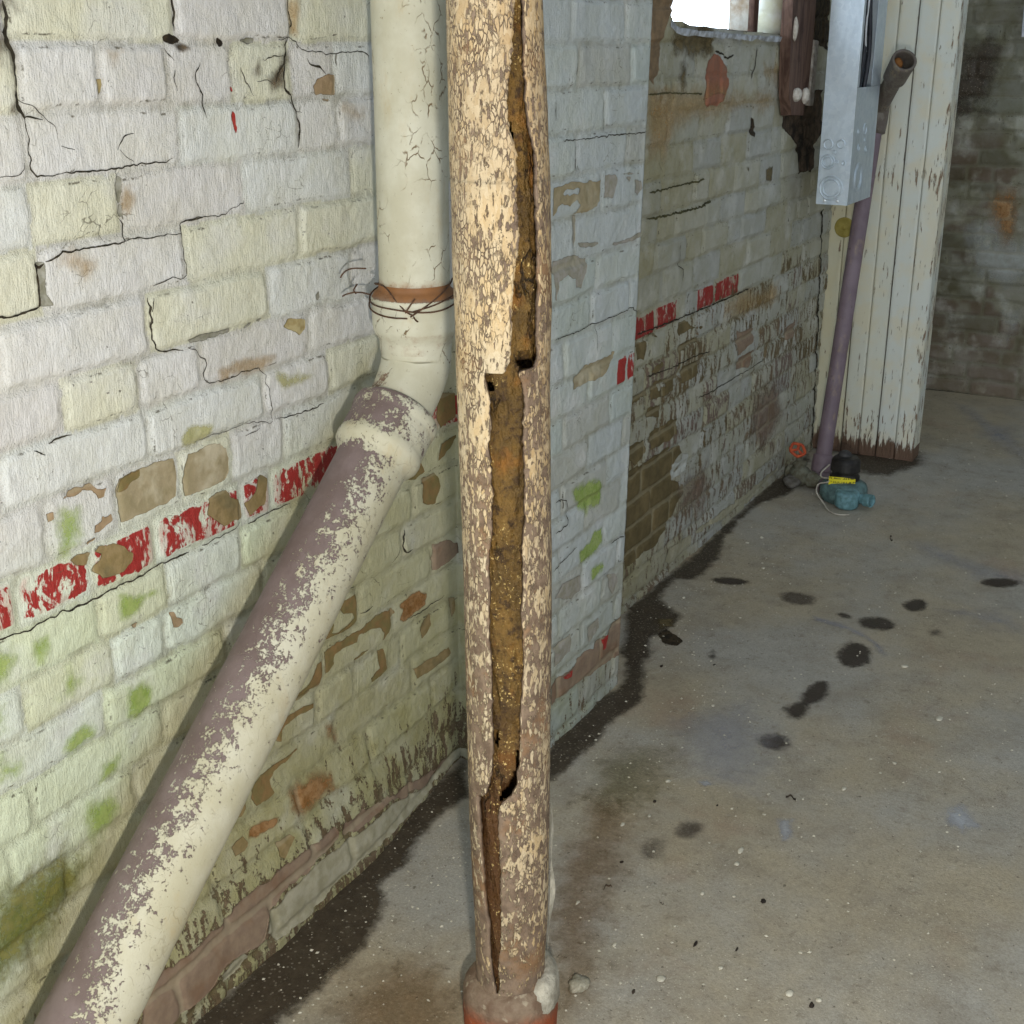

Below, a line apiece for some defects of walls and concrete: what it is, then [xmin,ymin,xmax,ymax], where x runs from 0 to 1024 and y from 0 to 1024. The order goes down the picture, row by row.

crack [0,0,172,178]
crack [240,0,369,147]
peeling [551,172,643,301]
crack [0,306,40,319]
crack [46,203,323,441]
peeling [63,444,267,578]
peeling [607,320,705,594]
peeling [276,594,394,742]
water stain [550,462,792,779]
water stain [783,681,828,717]
water stain [838,643,870,667]
water stain [838,613,894,630]